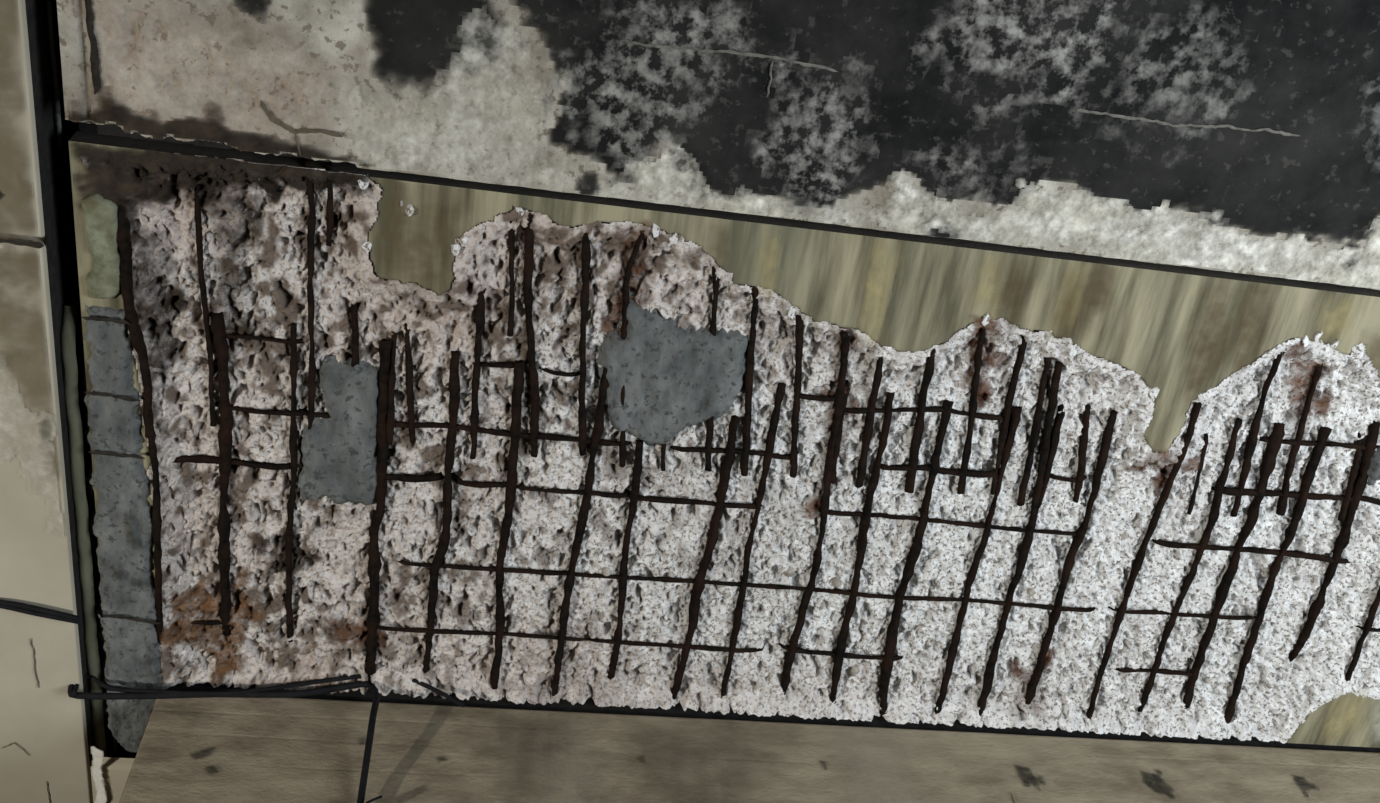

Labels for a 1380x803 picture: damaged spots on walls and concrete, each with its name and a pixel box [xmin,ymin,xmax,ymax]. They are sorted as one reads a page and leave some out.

spalling [76,0,333,155]
water stain [610,145,796,217]
water stain [871,171,1380,289]
spalling [117,155,1380,744]
corrosion [252,528,317,575]
crack [30,638,39,687]
corrosion [162,569,262,684]